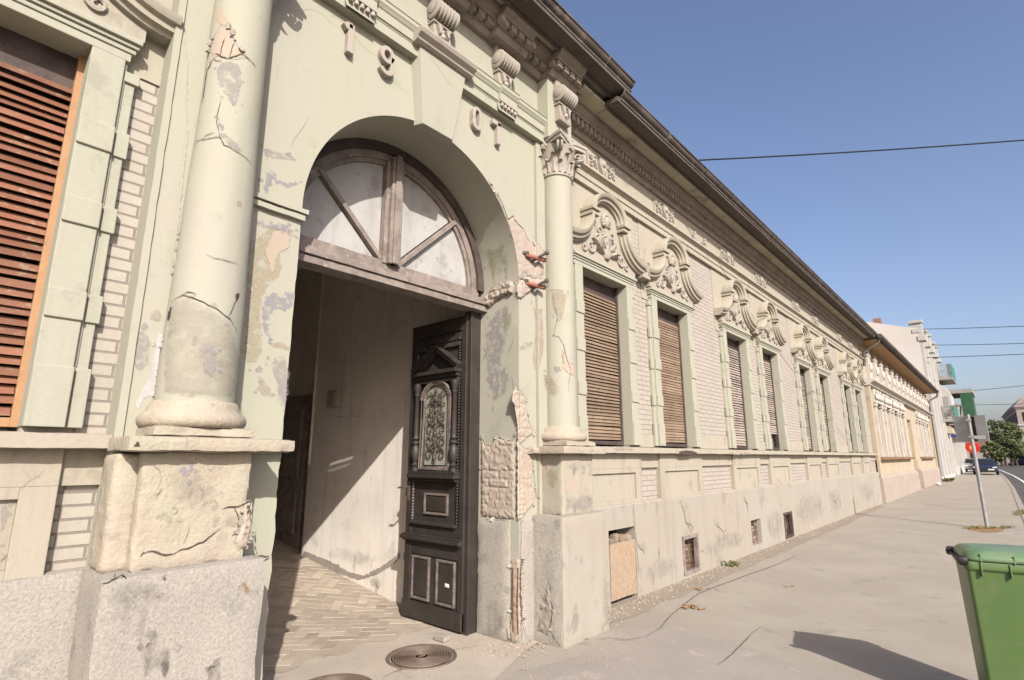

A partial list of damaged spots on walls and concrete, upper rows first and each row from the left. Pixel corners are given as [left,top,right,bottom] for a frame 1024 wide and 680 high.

spalling [205,22,247,106]
crack [171,33,278,330]
peeling [241,220,298,411]
spalling [479,181,566,522]
crack [141,465,269,581]
spalling [233,500,254,551]